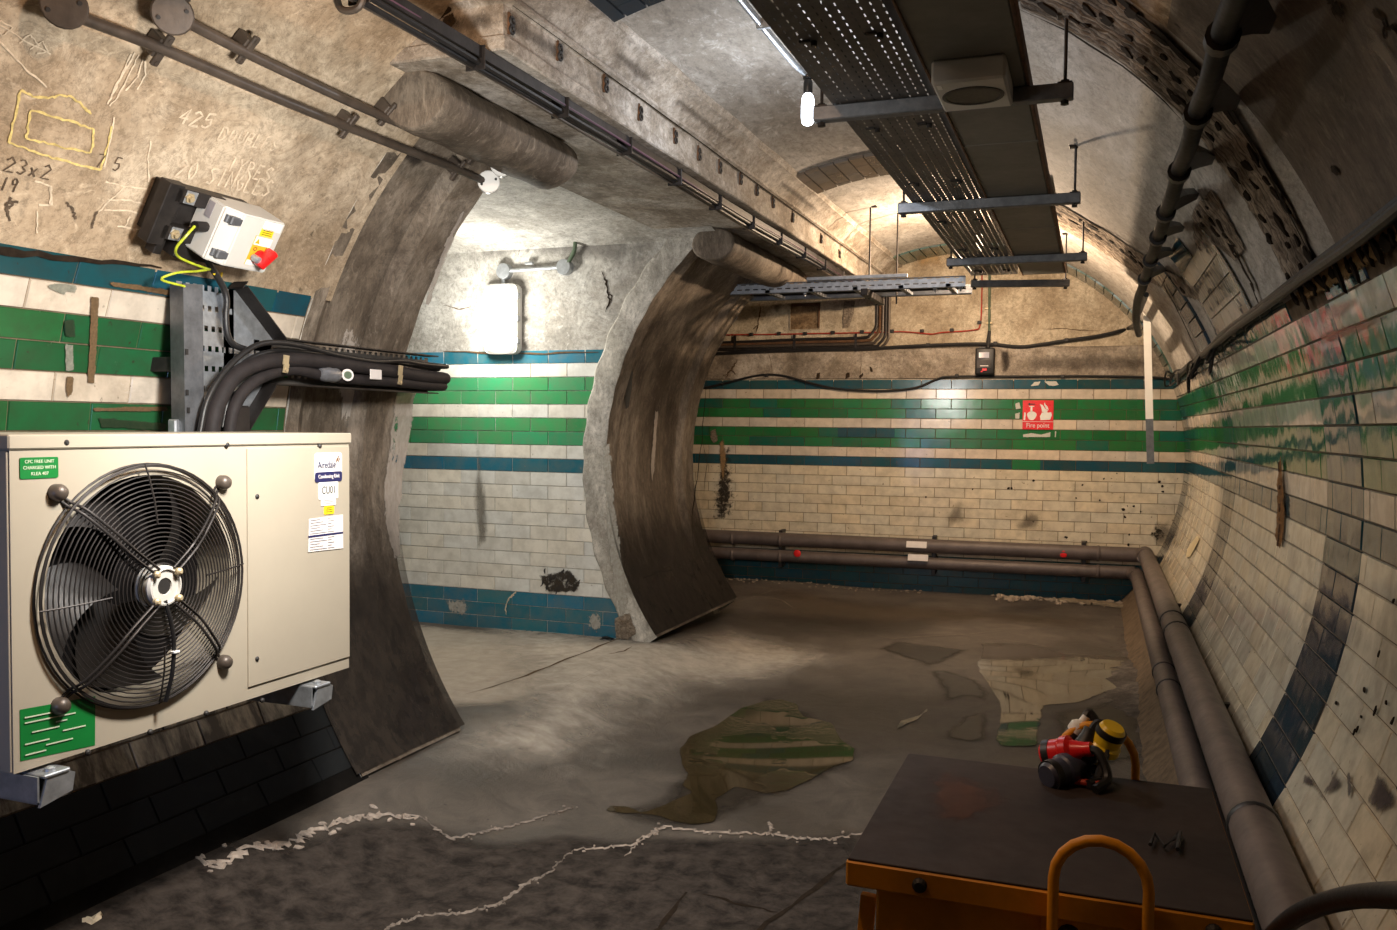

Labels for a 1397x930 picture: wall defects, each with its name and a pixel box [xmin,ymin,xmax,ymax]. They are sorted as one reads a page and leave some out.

spalling [1020,0,1199,115]
spalling [1191,190,1244,261]
spalling [1201,111,1397,310]
water stain [713,449,733,519]
crack [654,892,687,930]